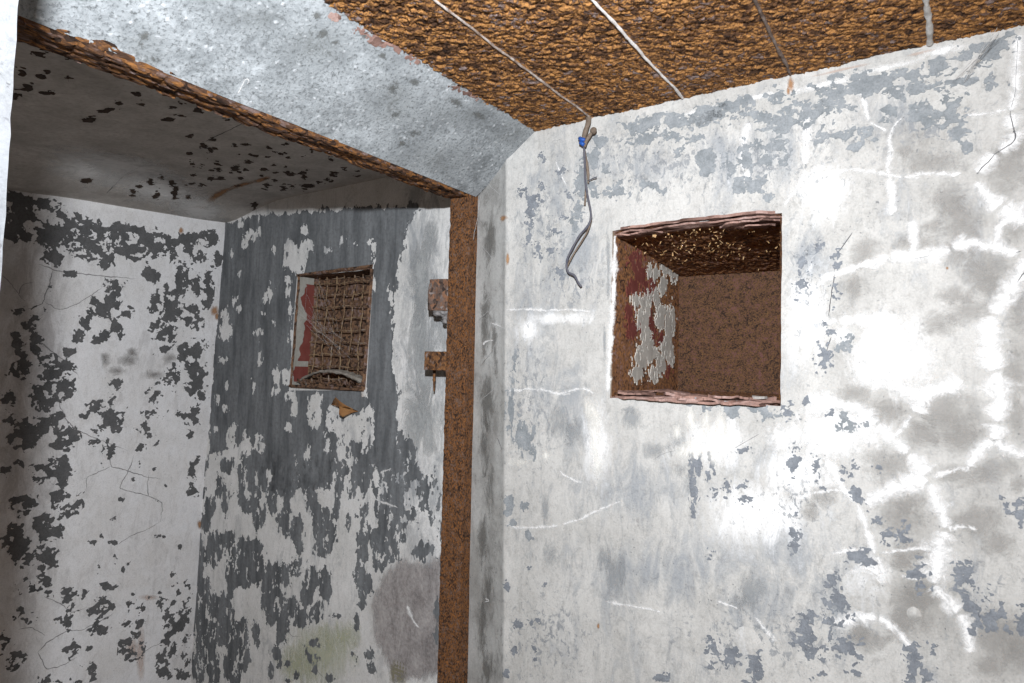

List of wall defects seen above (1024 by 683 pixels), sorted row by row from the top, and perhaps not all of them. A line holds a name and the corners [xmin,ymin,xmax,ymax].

spalling [129,134,361,200]
peeling [517,28,1021,281]
peeling [622,246,678,385]
peeling [791,240,855,374]
crack [785,35,1024,653]
peeling [0,190,445,683]
peeling [688,451,753,519]
peeling [786,440,826,491]
peeling [703,635,765,683]
peeling [787,457,933,681]
peeling [900,640,938,683]
peeling [950,557,1024,636]